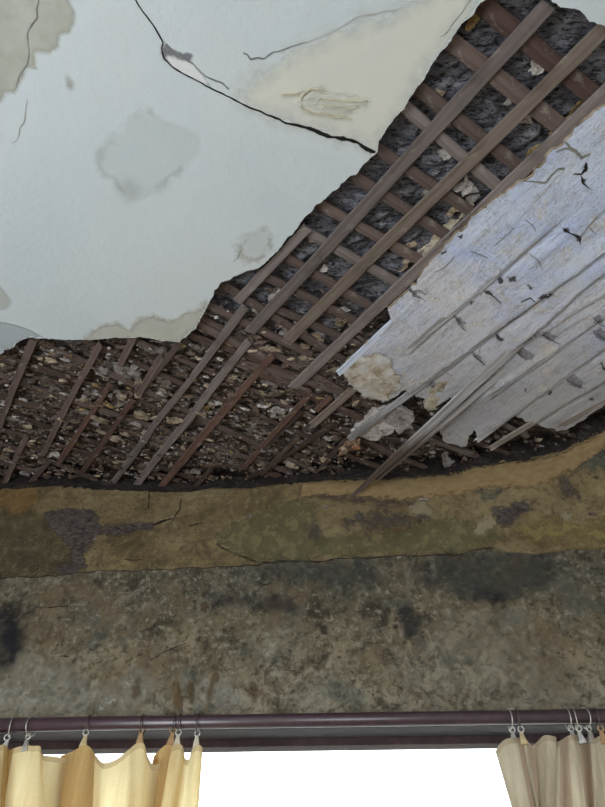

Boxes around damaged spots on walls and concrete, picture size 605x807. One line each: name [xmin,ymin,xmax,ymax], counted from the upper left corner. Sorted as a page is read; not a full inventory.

crack [12,0,39,143]
leakage [0,0,73,99]
crack [135,0,376,153]
crack [243,8,400,60]
spalling [423,49,474,101]
spalling [456,13,506,57]
spalling [495,0,596,57]
spalling [461,83,516,133]
peeling [0,103,605,578]
crack [0,543,493,579]
leakage [394,607,420,638]
leakage [0,609,72,709]